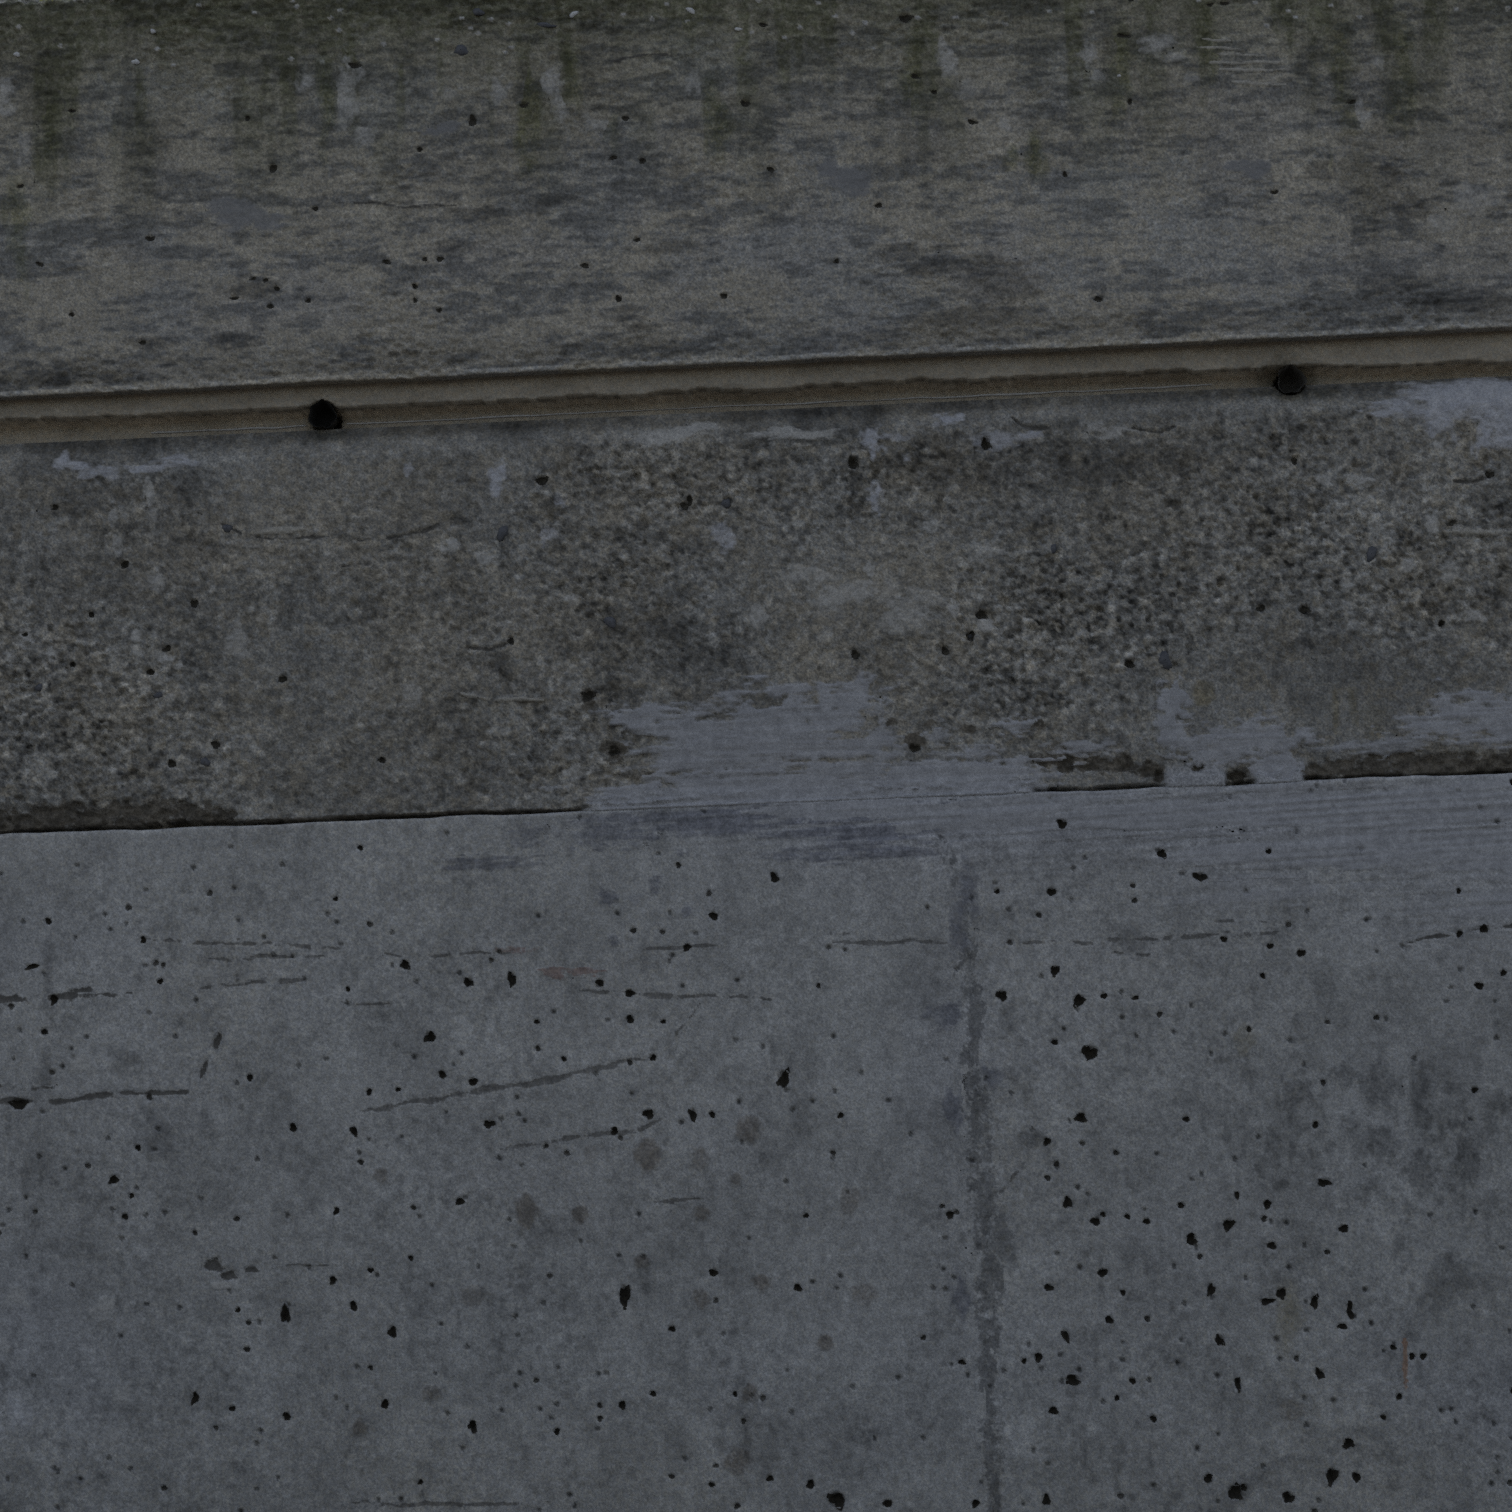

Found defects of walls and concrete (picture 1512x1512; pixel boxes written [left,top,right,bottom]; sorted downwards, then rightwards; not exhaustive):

damp [0,31,95,389]
damp [291,39,384,192]
damp [424,30,631,258]
damp [681,61,758,181]
damp [811,11,984,203]
damp [1070,0,1227,141]
damp [1284,0,1512,316]
damp [861,238,1062,335]
spalling [578,691,599,714]
spalling [556,738,656,783]
spalling [884,714,940,753]
spalling [1298,746,1512,781]